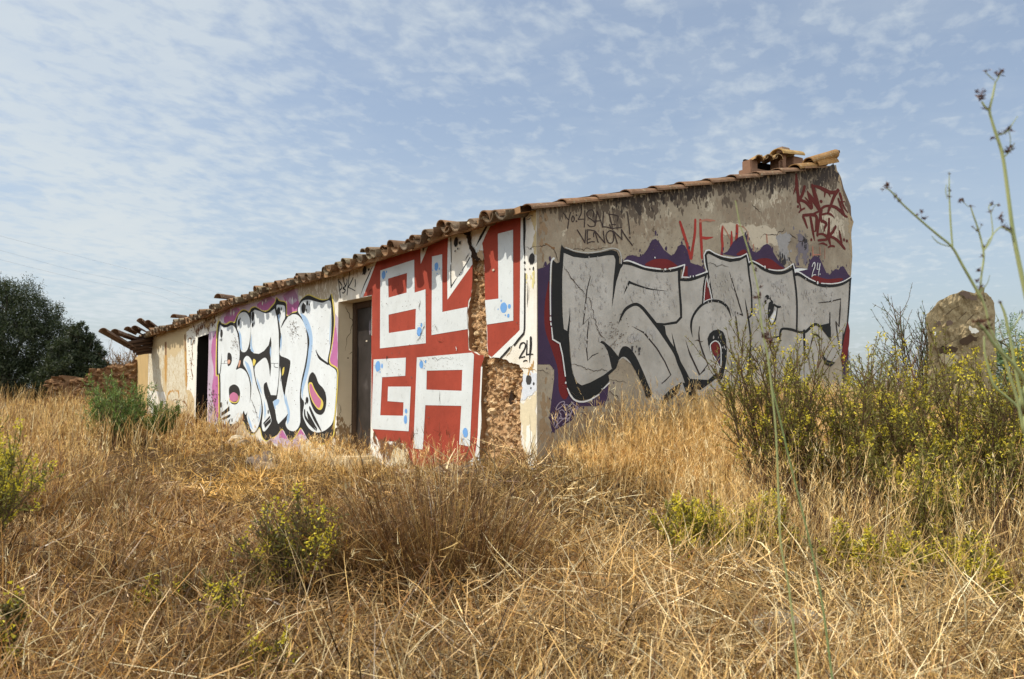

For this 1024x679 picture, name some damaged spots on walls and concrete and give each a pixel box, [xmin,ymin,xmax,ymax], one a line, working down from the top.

crack [463,231,480,261]
leakage [539,163,840,357]
peeling [509,372,537,457]